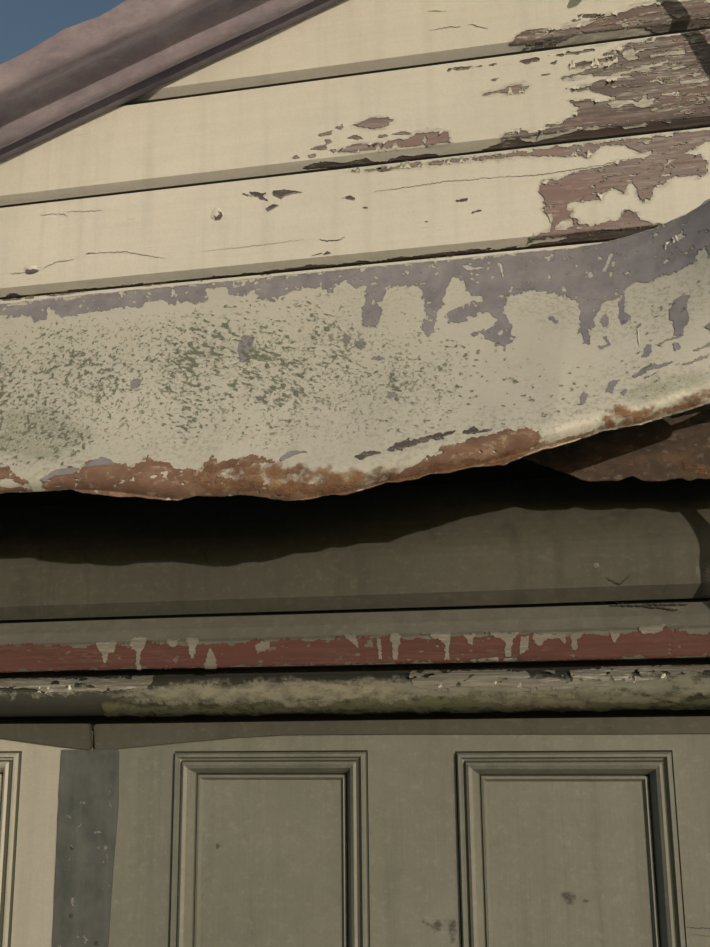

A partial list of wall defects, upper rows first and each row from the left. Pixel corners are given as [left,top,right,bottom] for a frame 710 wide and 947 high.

peeling [0,0,710,351]
peeling [632,295,710,378]
peeling [606,379,627,396]
peeling [41,457,114,482]
rust [0,389,710,501]
peeling [355,426,492,459]
peeling [0,626,710,710]